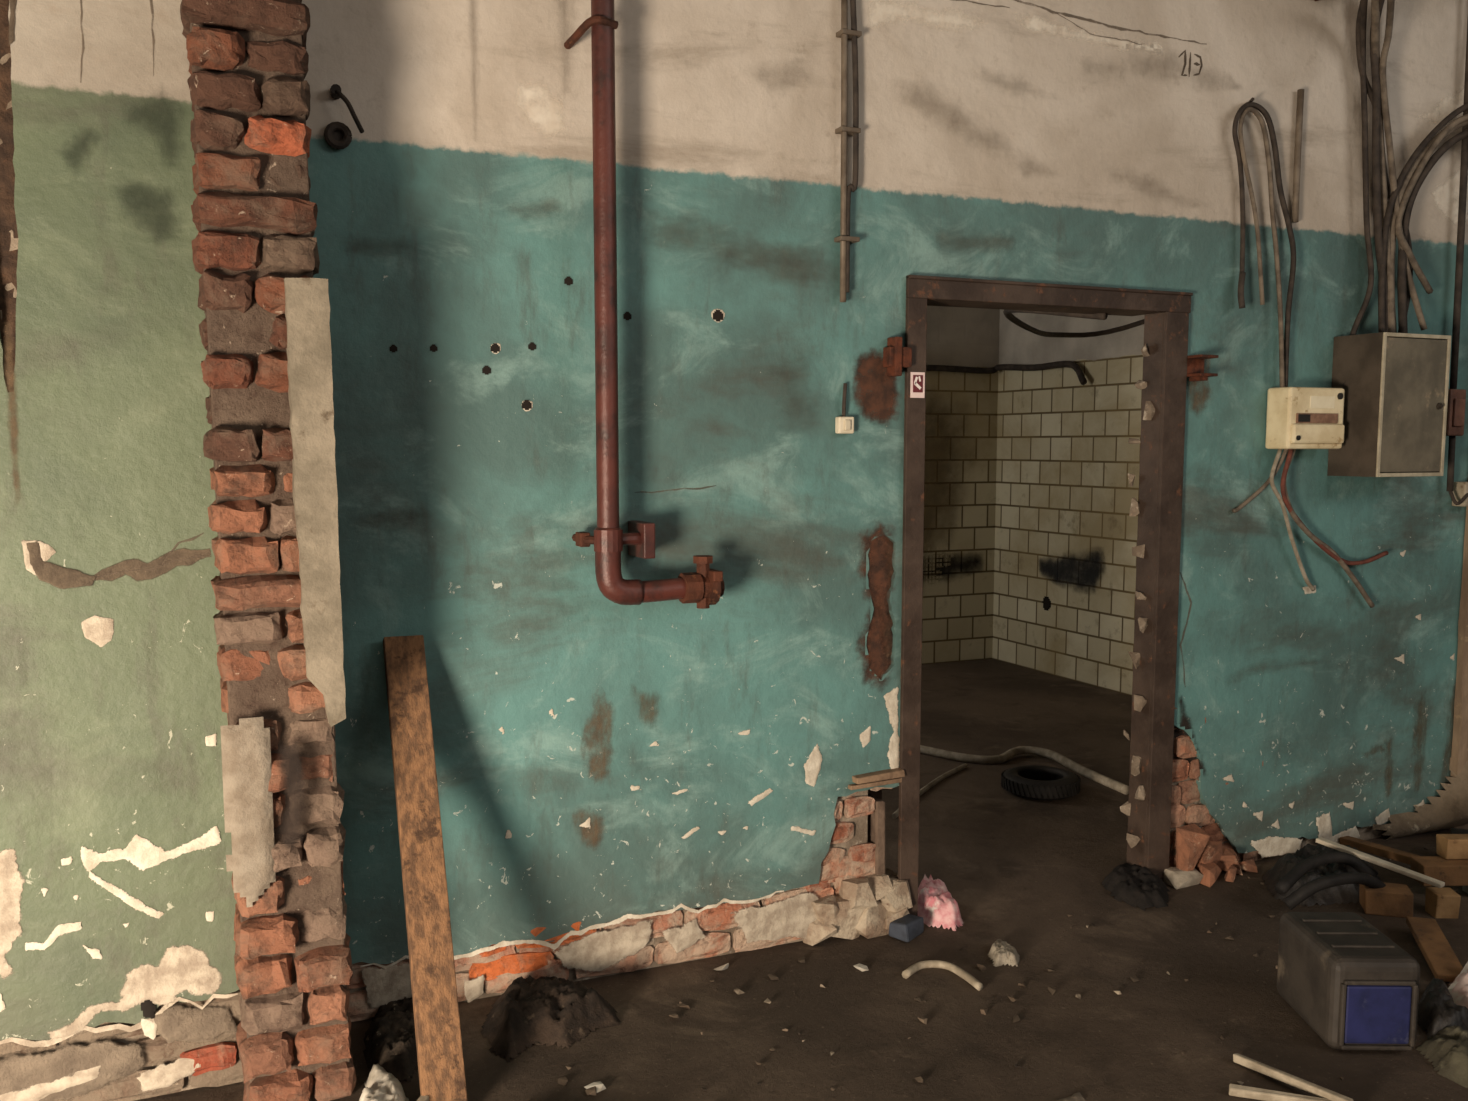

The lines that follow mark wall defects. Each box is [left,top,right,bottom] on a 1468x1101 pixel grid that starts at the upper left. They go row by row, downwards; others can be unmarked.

crack [955,0,1204,45]
corrosion [854,352,898,423]
peeling [205,734,217,746]
spalling [454,525,913,1003]
spalling [1169,572,1360,887]
peeling [1375,808,1390,825]
peeling [61,826,221,927]
peeling [0,849,102,1012]
spalling [0,945,244,1101]
spalling [348,955,412,1022]